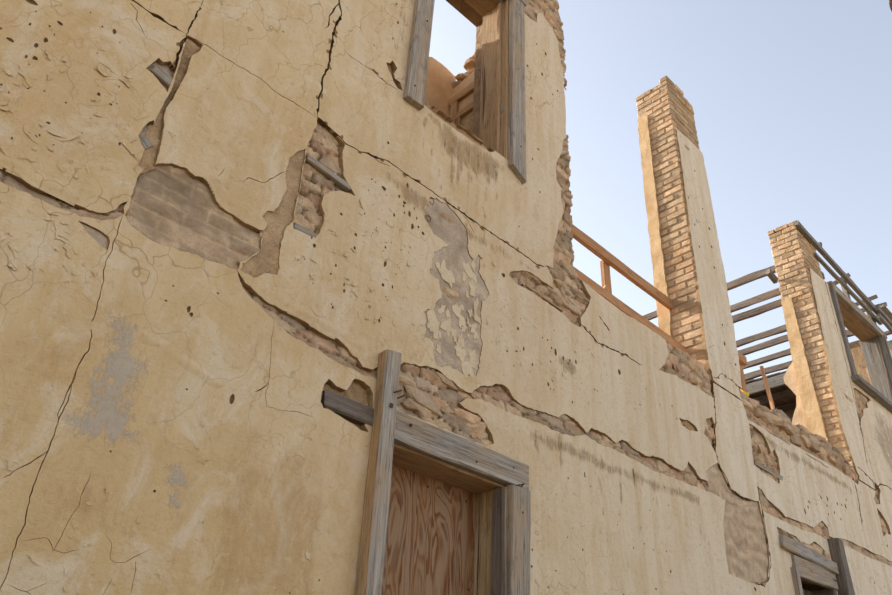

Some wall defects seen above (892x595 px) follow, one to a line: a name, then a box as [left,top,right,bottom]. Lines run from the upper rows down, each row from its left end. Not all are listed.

spalling [0,39,378,406]
crack [130,0,544,269]
spalling [499,135,589,326]
spalling [524,0,567,95]
crack [0,218,122,595]
crack [580,316,643,366]
peeling [393,183,892,591]
crack [852,412,892,522]
crack [103,534,146,595]